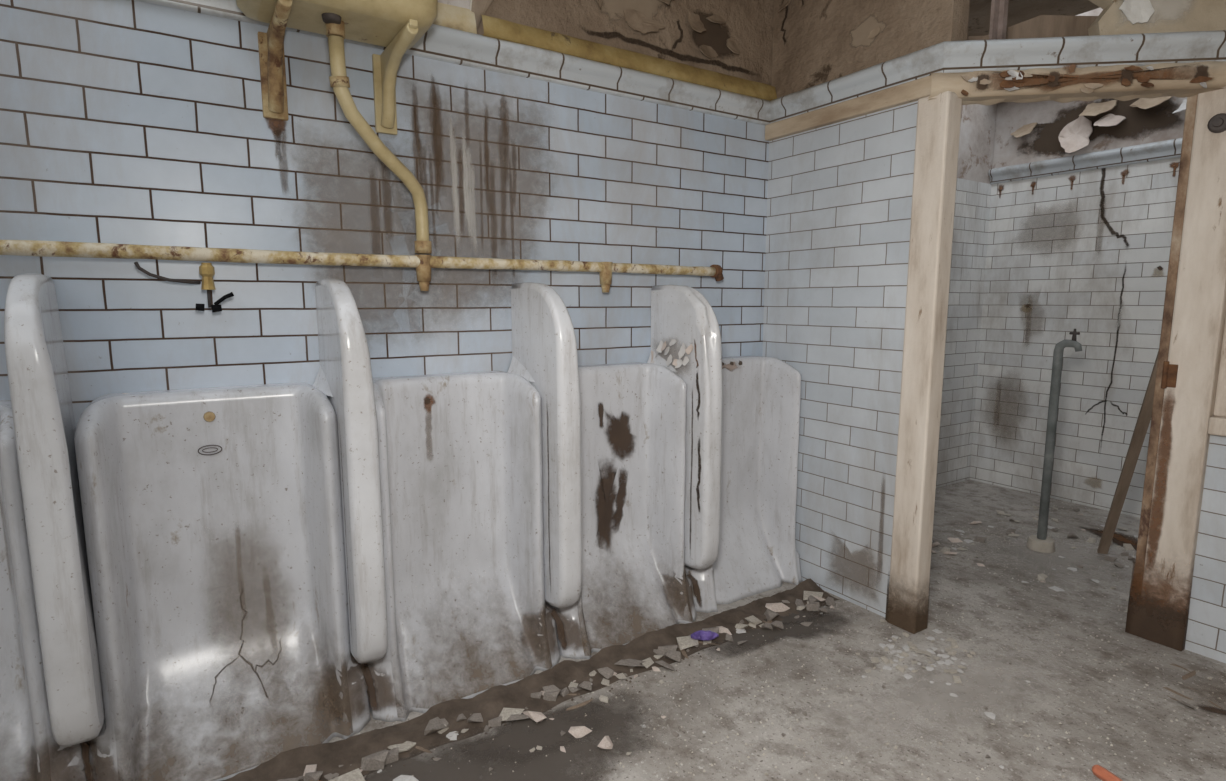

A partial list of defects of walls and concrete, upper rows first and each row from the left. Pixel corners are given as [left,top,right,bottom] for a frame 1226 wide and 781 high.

crack [777,0,804,44]
corrosion [961,64,1215,95]
flaking render [1010,96,1187,155]
leakage [1125,398,1192,651]
leakage [885,588,929,634]